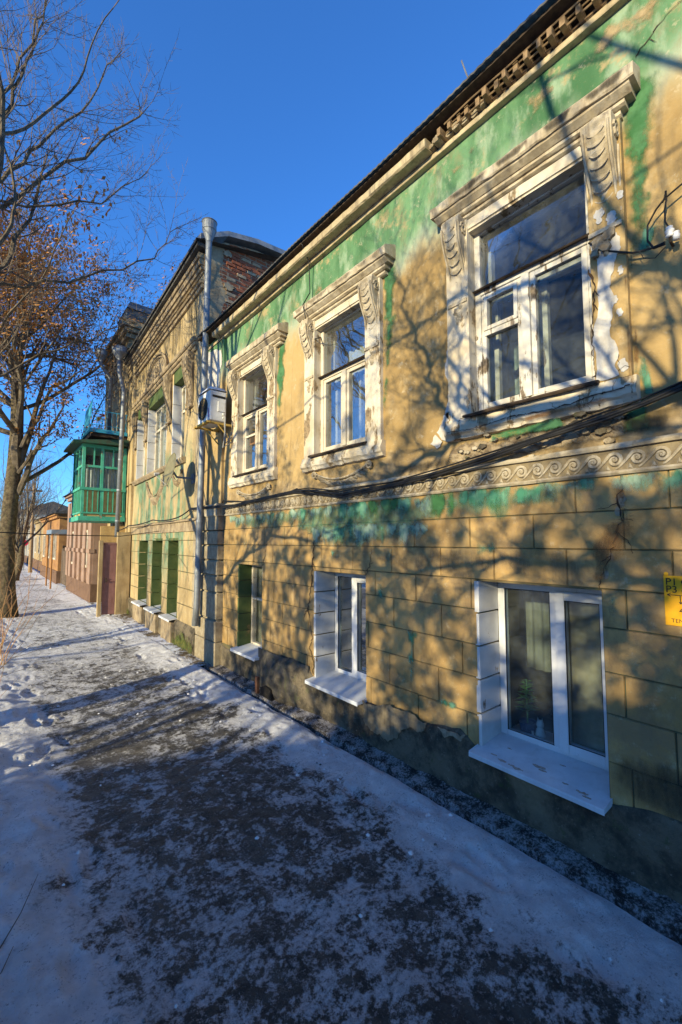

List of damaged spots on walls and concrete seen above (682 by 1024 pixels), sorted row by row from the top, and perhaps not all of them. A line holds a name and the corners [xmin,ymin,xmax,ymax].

peeling [598,0,655,52]
spalling [219,244,274,313]
peeling [431,77,656,465]
peeling [230,478,594,556]
crack [597,475,633,589]